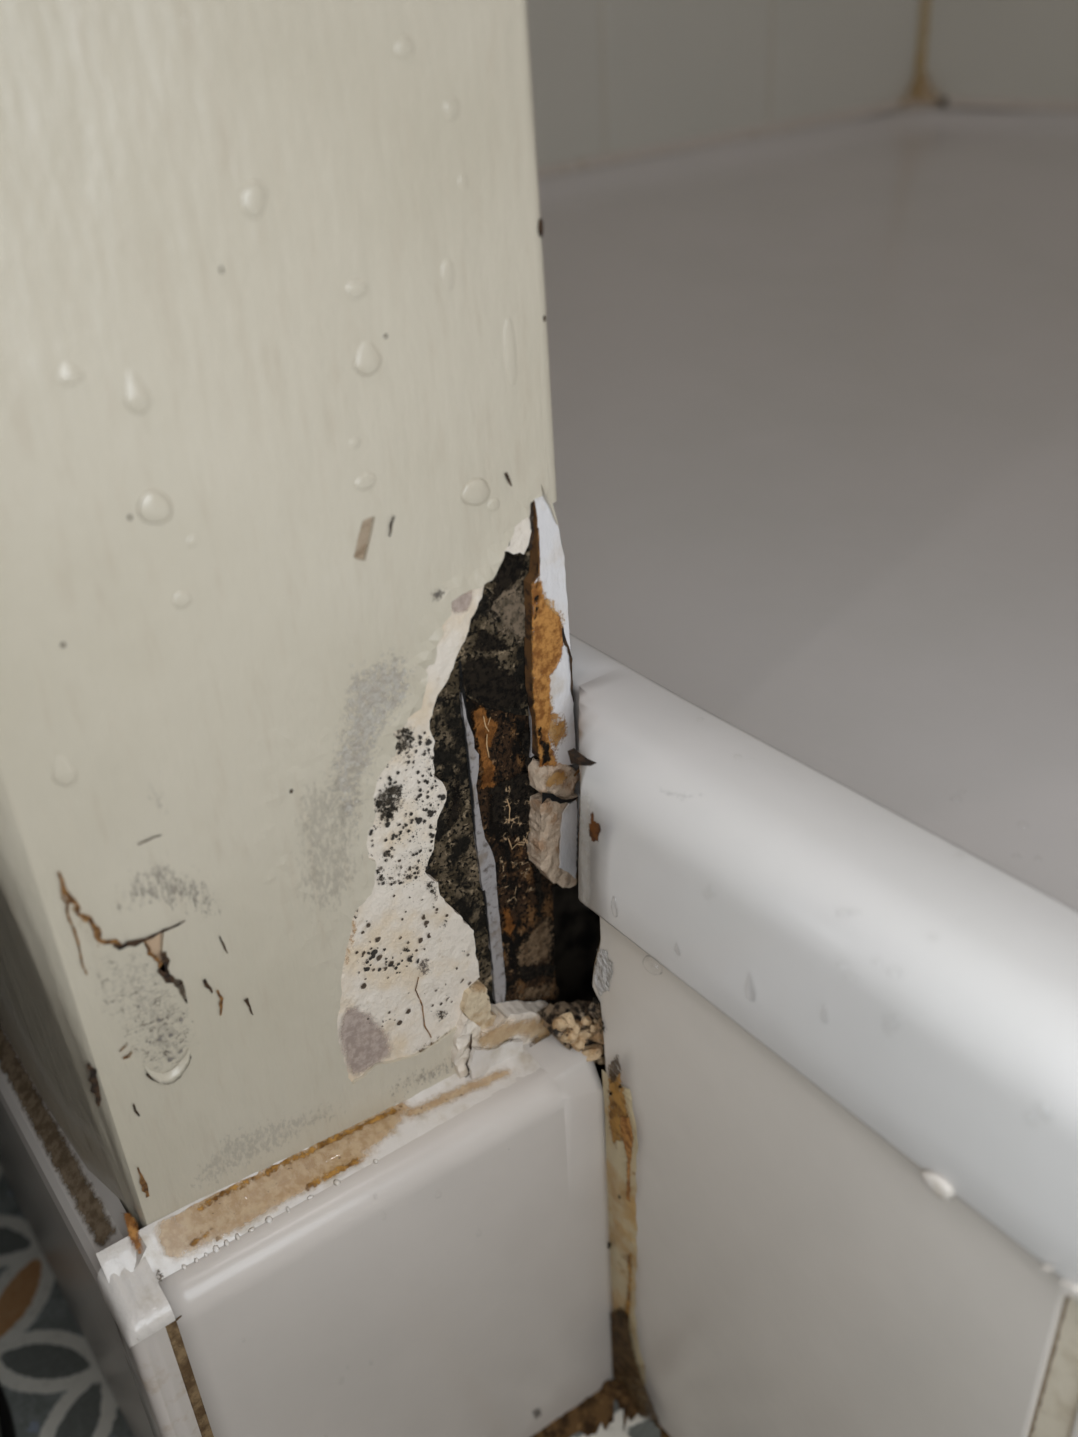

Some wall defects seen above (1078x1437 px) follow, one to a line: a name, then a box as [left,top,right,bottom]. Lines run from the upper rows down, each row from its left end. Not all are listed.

spalling [337,501,612,1082]
spalling [594,1063,606,1087]
damp [608,1072,634,1202]
damp [610,1253,639,1376]